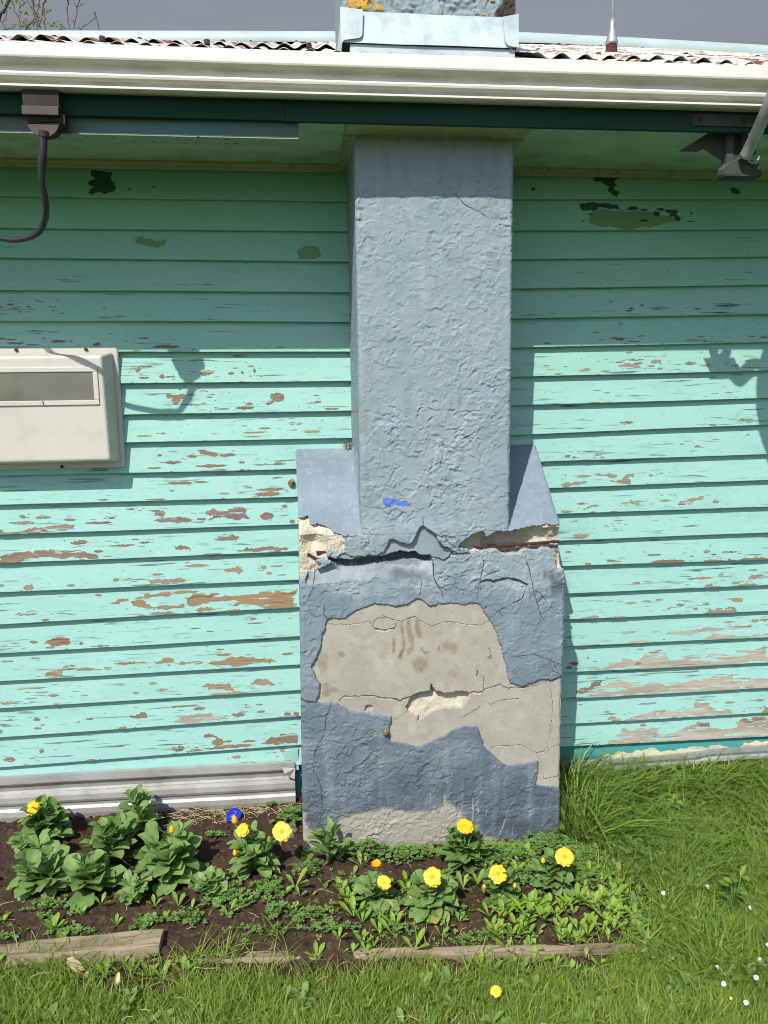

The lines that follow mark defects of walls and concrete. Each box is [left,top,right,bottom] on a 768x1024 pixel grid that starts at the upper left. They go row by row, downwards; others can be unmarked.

peeling [579,332,758,375]
peeling [166,388,339,433]
peeling [0,509,152,563]
flaking render [95,433,671,624]
rust [474,540,559,551]
peeling [0,637,293,706]
crack [307,521,561,780]
spalling [311,546,768,788]
peeling [118,707,147,729]
peeling [170,678,298,763]
crack [300,695,411,812]
peeling [303,799,465,853]